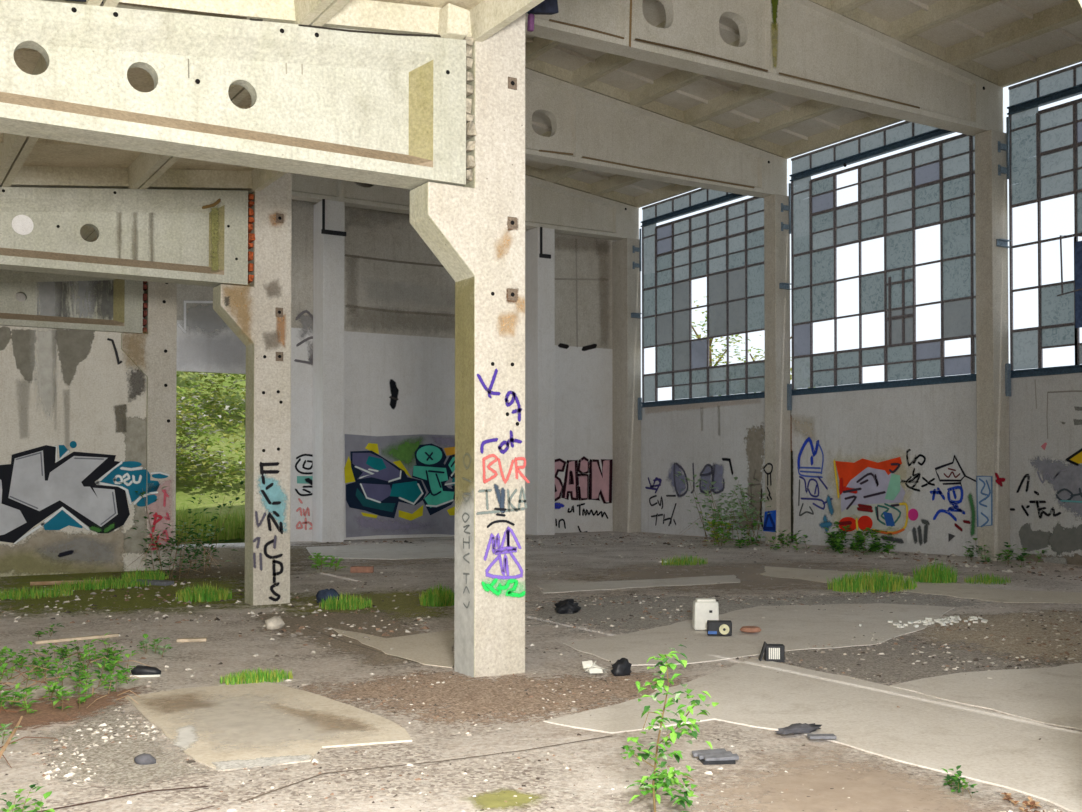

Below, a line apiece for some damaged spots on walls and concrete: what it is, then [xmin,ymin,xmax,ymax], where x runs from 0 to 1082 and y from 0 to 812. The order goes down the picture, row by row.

corrosion [501,288,525,332]